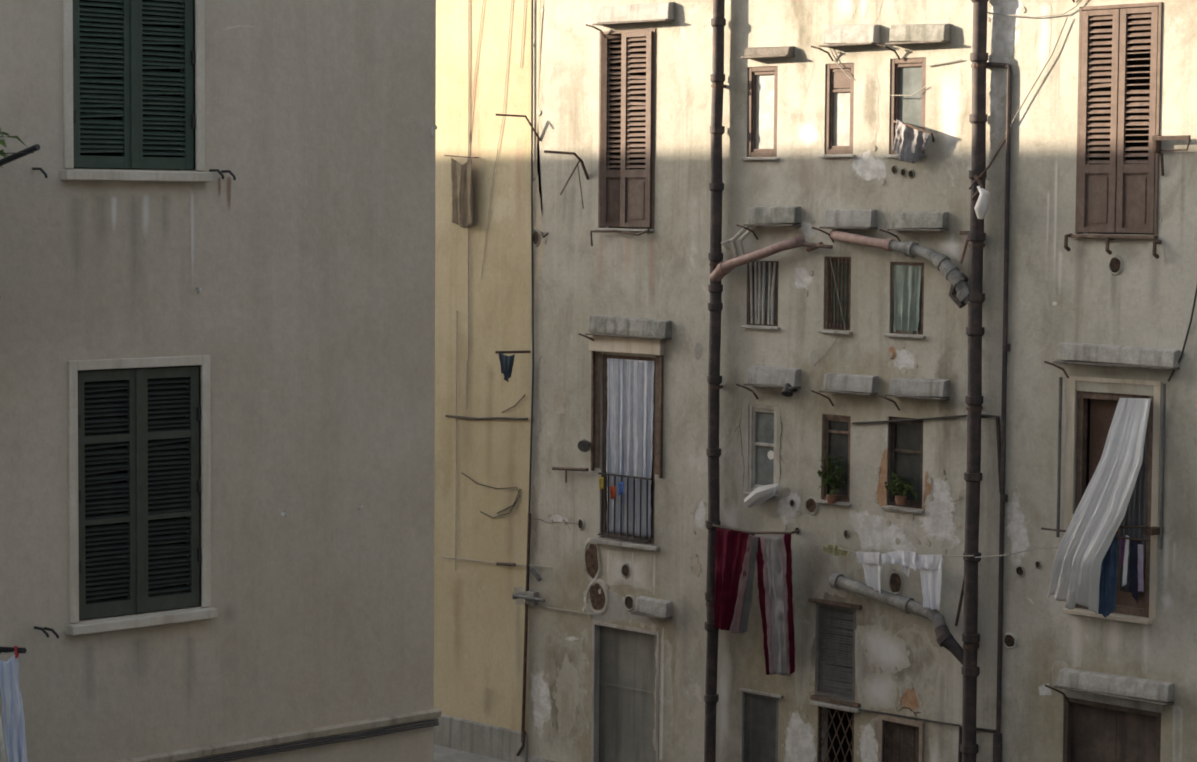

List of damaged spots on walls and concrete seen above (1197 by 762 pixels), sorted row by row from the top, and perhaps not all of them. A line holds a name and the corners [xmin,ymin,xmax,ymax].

peeling [849,145,915,185]
flaking render [531,353,542,502]
peeling [547,514,653,615]
spalling [888,568,904,595]
peeling [843,447,963,552]
peeling [1004,486,1041,577]
peeling [528,666,556,740]
flaking render [782,710,817,762]